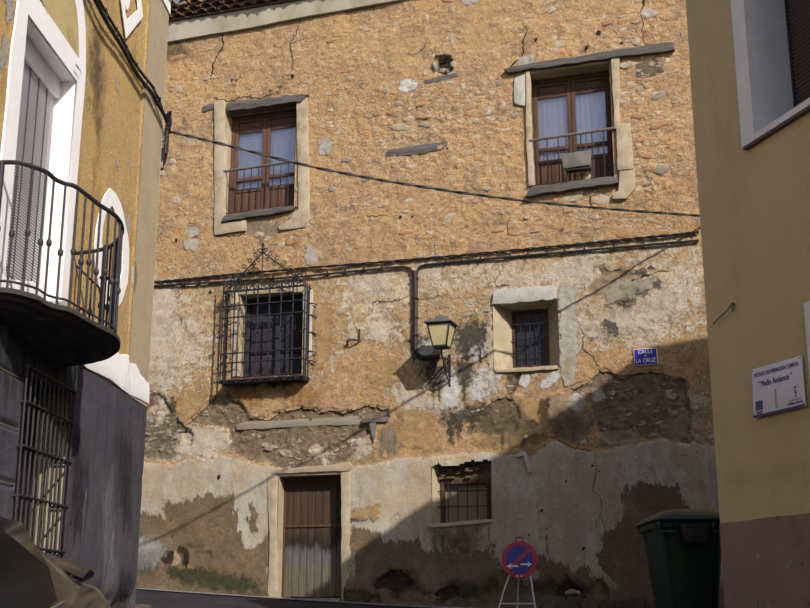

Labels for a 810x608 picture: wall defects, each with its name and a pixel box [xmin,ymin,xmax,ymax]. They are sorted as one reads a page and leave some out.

crack [210,34,225,79]
crack [289,23,305,74]
flaking render [560,191,613,204]
spalling [144,271,695,468]
damp [409,314,538,445]
crack [576,323,599,366]
crack [551,437,605,533]
peeling [346,480,690,608]